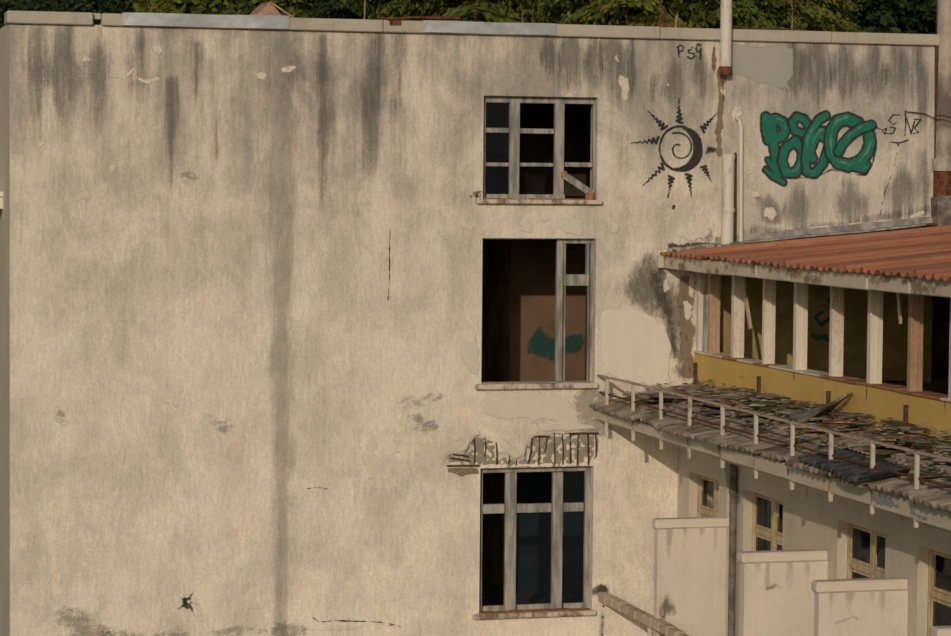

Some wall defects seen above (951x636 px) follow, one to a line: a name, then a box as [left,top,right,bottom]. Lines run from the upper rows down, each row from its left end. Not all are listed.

corrosion [712,46,726,156]
leakage [668,227,715,252]
leakage [628,257,696,378]
peeling [446,393,598,468]